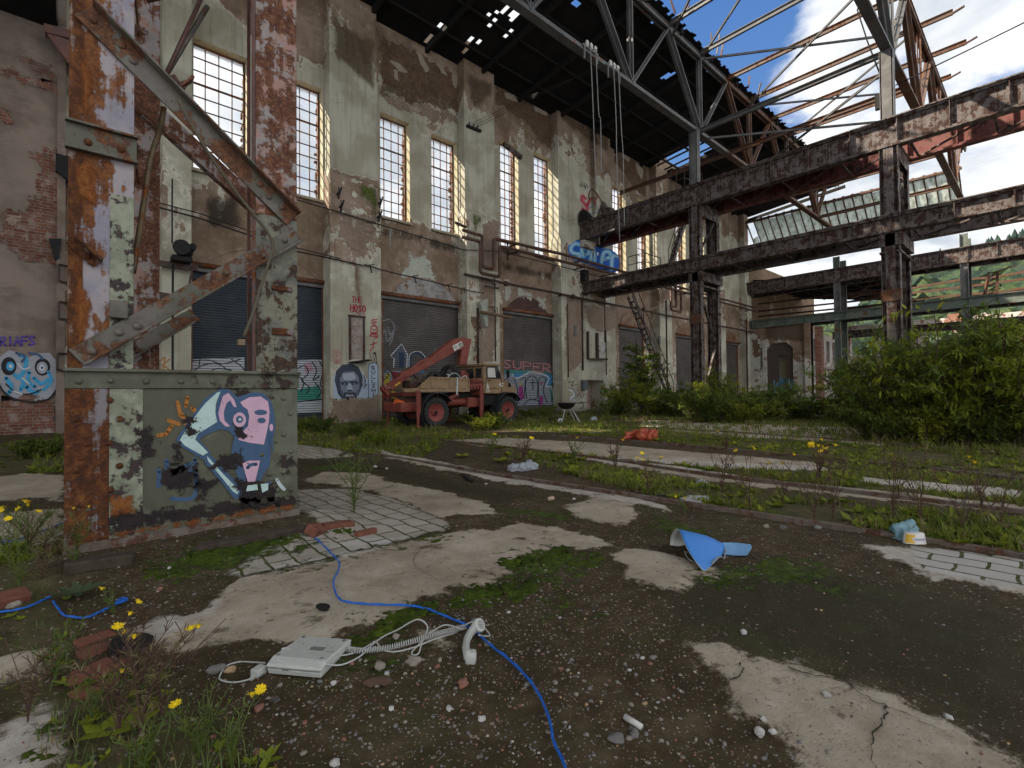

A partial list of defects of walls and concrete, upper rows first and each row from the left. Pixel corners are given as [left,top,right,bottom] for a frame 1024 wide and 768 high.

flaking render [0,55,69,95]
corrosion [69,0,84,121]
peeling [378,35,458,124]
flaking render [0,146,68,267]
corrosion [67,149,98,368]
peeling [338,208,379,257]
peeling [108,413,300,535]
crack [726,662,745,694]
crack [788,666,951,768]